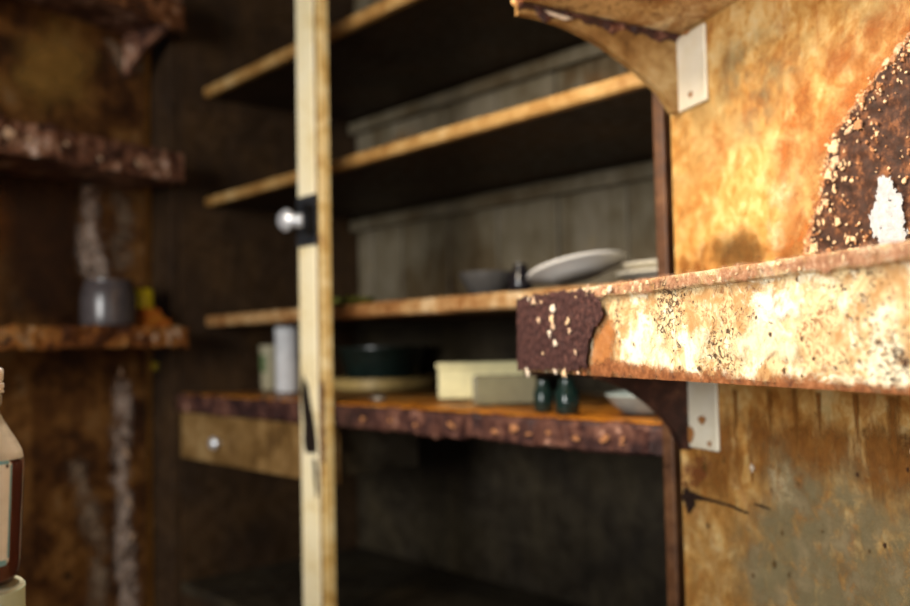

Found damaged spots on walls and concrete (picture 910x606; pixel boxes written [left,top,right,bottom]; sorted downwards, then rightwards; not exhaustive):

rust [778,140,790,177]
rust [782,20,910,256]
rust [681,388,910,497]